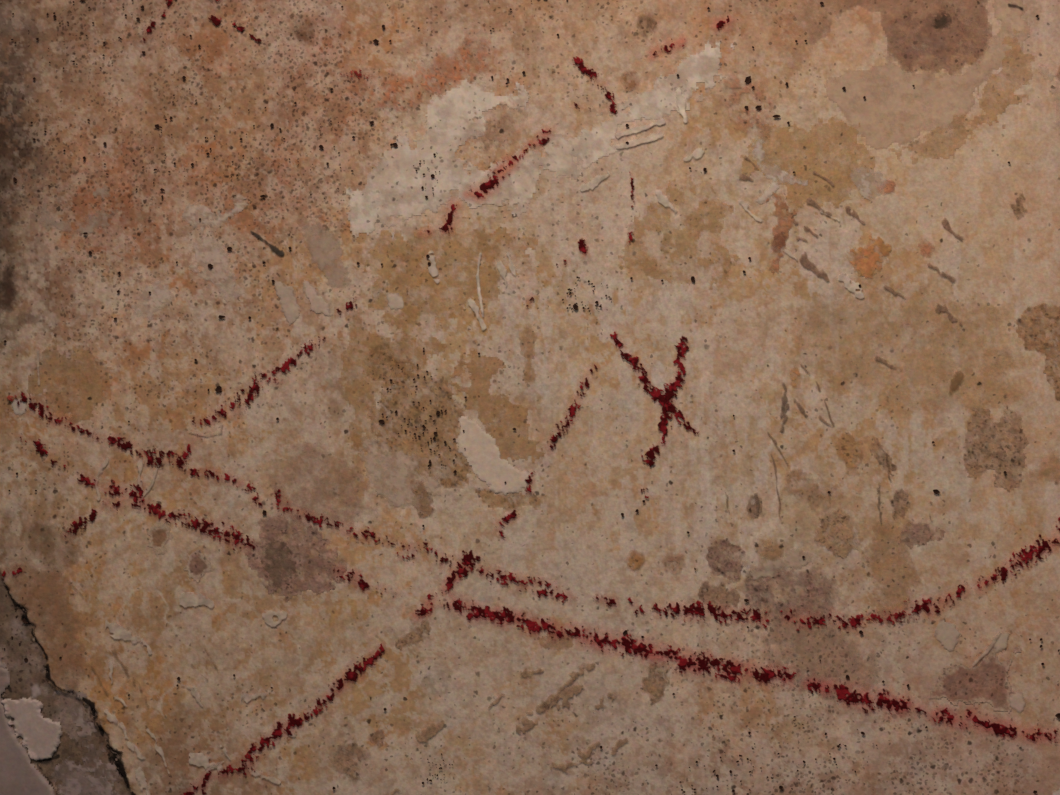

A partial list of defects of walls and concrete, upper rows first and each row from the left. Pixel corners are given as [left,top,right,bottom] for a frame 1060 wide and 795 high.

spalling [0,574,132,795]